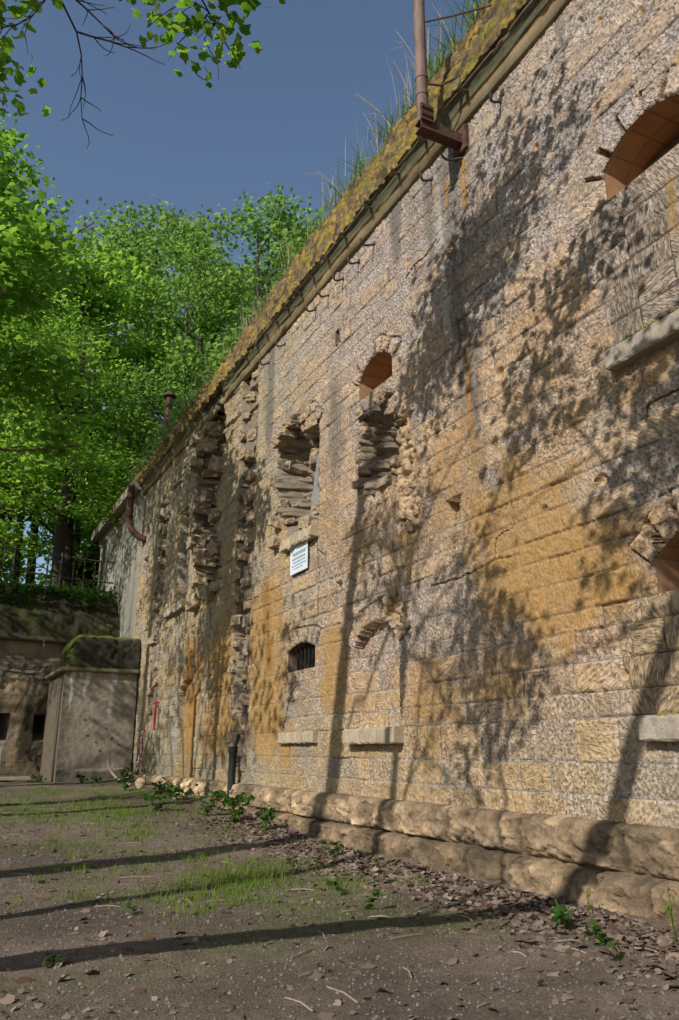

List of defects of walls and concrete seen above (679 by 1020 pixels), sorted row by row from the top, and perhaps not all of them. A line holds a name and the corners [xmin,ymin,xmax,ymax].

spalling [267,401,320,550]
spalling [351,387,422,532]
spalling [185,366,260,771]
crack [431,528,518,587]
water stain [17,667,50,764]
water stain [69,671,92,706]